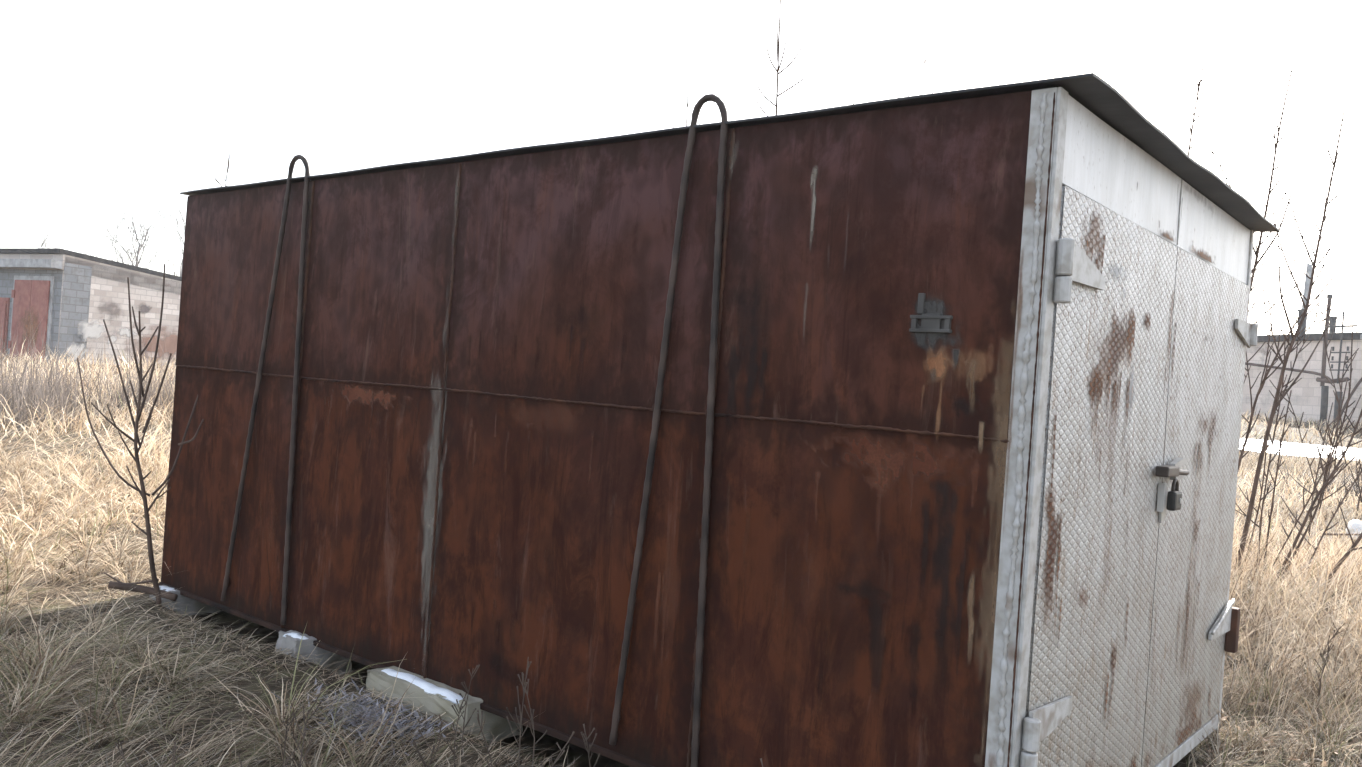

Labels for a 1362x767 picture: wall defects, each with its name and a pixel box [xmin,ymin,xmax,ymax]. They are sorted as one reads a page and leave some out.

corrosion [1087,214,1105,274]
corrosion [1089,310,1150,436]
corrosion [324,384,418,425]
corrosion [1043,415,1062,640]
corrosion [1177,690,1211,746]